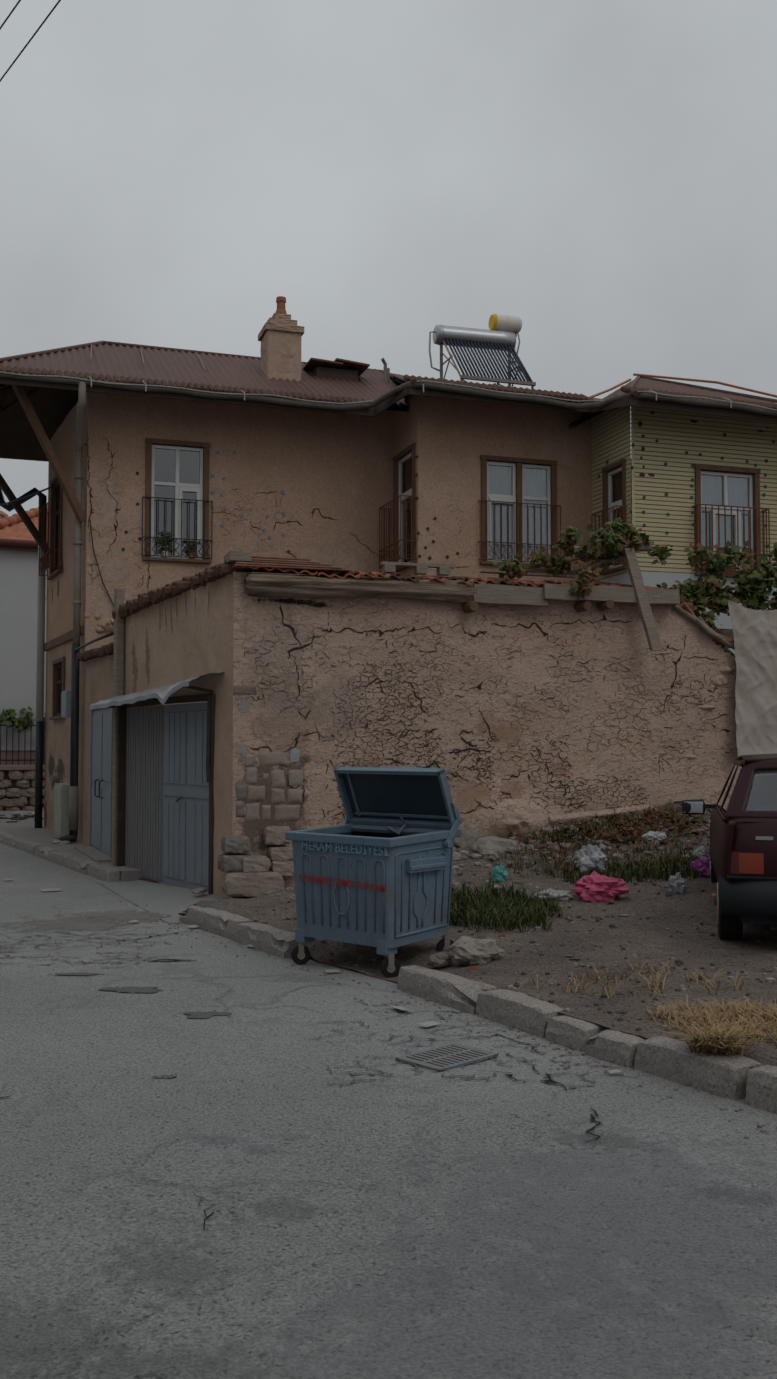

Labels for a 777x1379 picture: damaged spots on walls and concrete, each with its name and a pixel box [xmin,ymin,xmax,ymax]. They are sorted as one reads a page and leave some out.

crack [83,432,151,596]
crack [244,605,730,826]
flaking render [236,748,310,852]
crack [314,1001,640,1142]